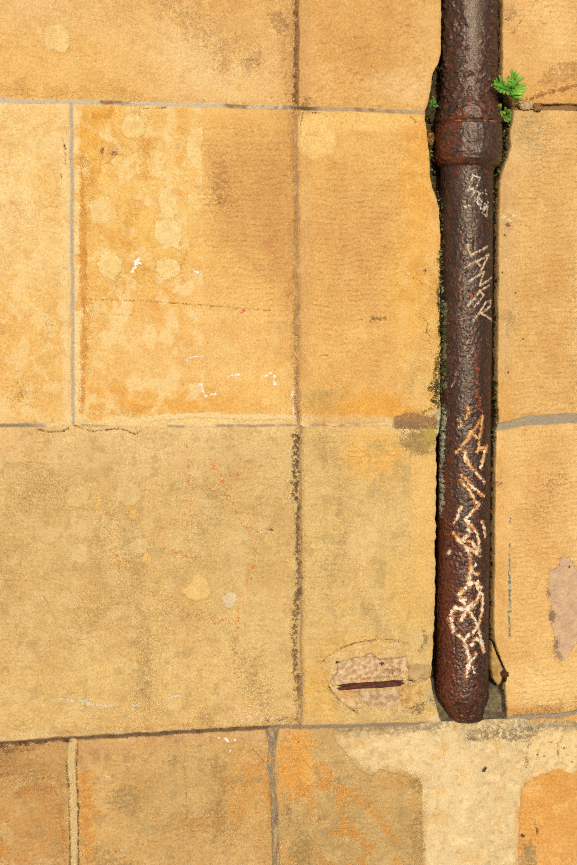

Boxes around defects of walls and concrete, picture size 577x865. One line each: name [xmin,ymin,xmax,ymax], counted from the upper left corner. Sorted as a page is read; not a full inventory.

spalling [546,556,577,664]
spalling [321,638,430,720]